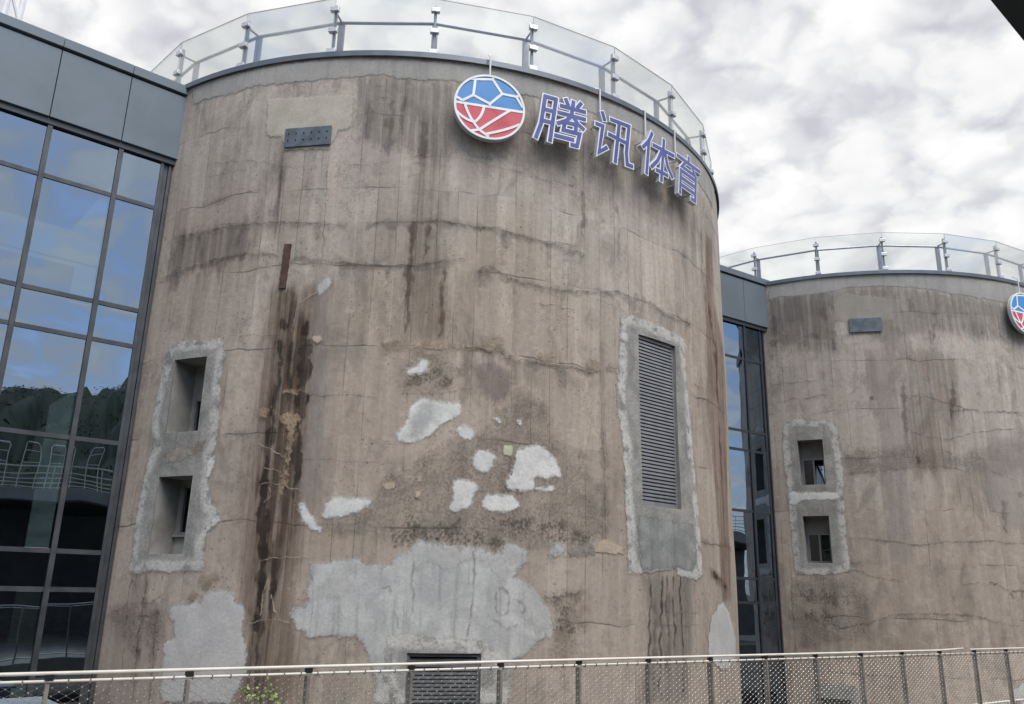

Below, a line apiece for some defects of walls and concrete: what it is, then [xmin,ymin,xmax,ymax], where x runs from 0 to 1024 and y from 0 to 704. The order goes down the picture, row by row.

rust [278,244,292,289]
leakage [407,223,415,306]
leakage [648,577,684,665]